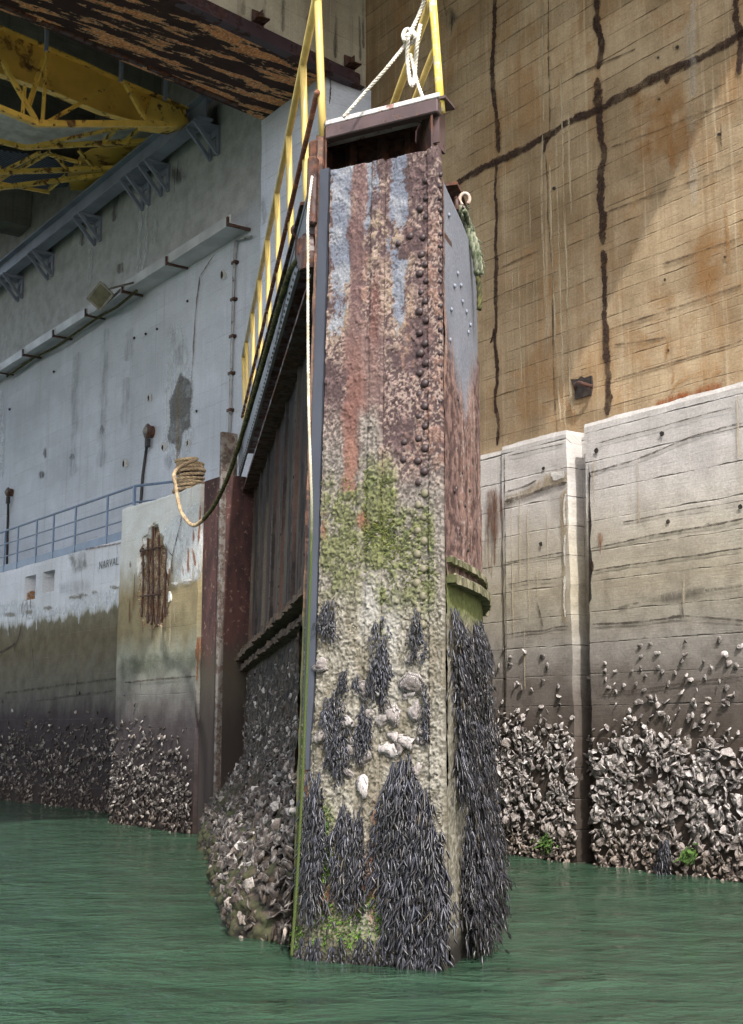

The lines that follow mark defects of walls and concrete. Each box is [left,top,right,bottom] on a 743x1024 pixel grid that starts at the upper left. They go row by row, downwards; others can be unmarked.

spalling [161,329,192,460]
crack [457,0,743,696]
spalling [136,511,202,629]